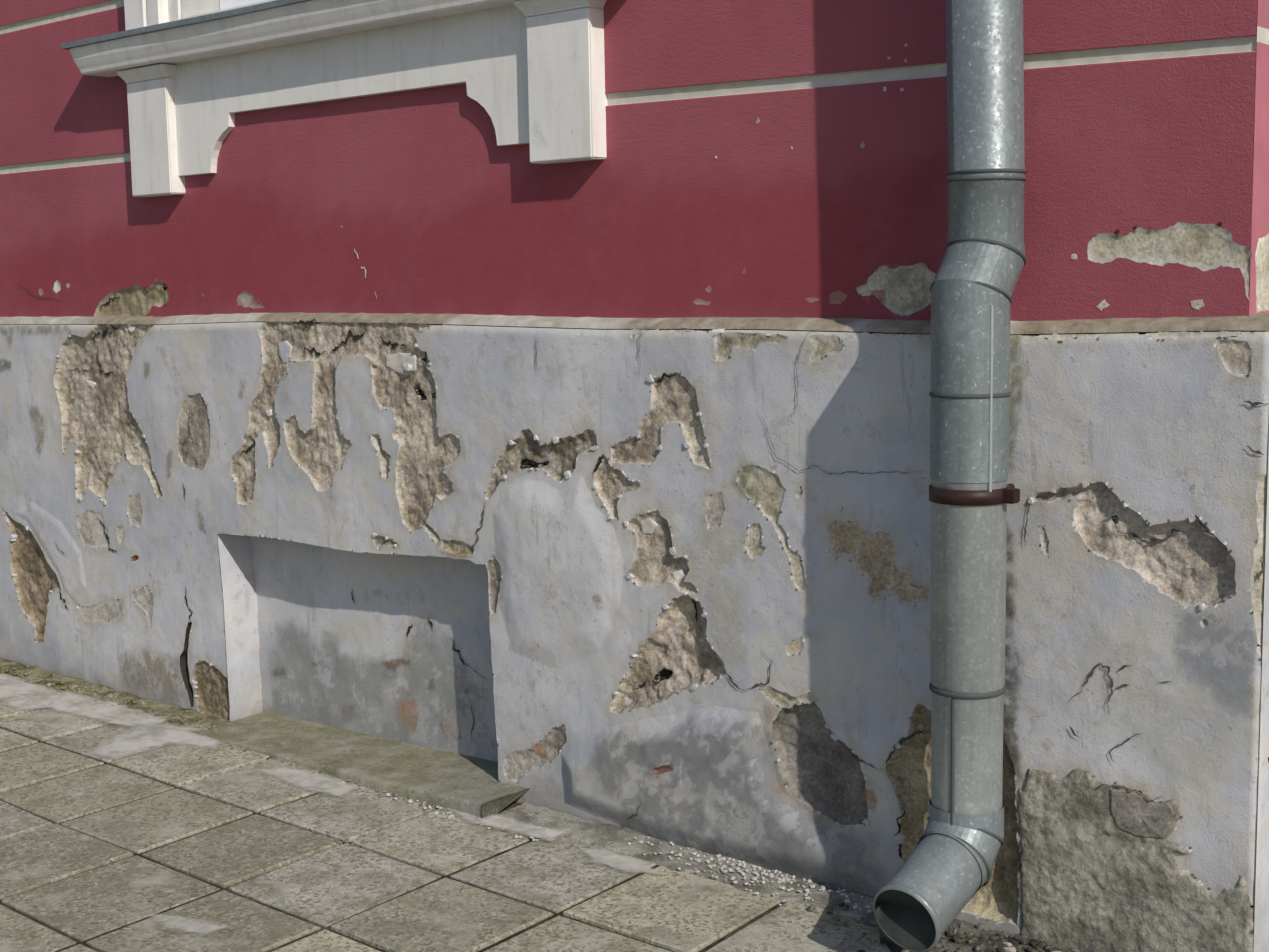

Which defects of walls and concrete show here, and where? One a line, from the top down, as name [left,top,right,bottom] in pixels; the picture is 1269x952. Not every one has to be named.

peeling [1070,222,1269,313]
flaking render [54,280,169,554]
flaking render [229,293,474,557]
crack [757,330,922,475]
flaking render [3,509,154,644]
crack [180,588,194,707]
flaking render [485,372,726,714]
flaking render [758,686,875,826]
crack [1068,663,1170,739]
crack [1109,734,1140,764]
flaking render [1027,474,1268,657]
flaking render [960,737,1254,952]